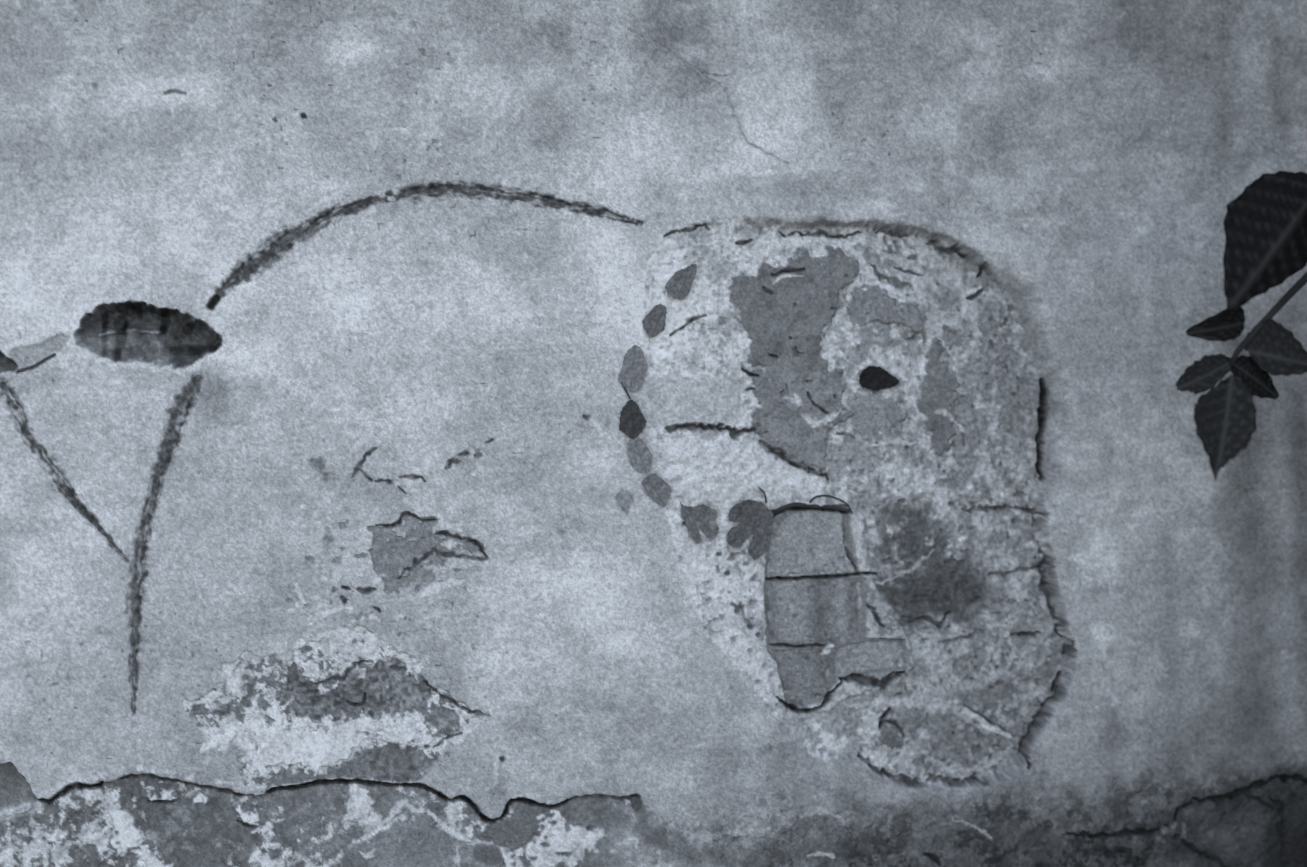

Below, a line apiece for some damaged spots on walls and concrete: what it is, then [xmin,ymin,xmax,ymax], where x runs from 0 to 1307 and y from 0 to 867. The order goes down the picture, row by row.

crack [627,27,792,167]
spalling [0,299,225,376]
peeling [443,437,497,476]
spalling [637,216,1081,793]
peeling [0,446,673,867]
crack [1064,771,1307,867]